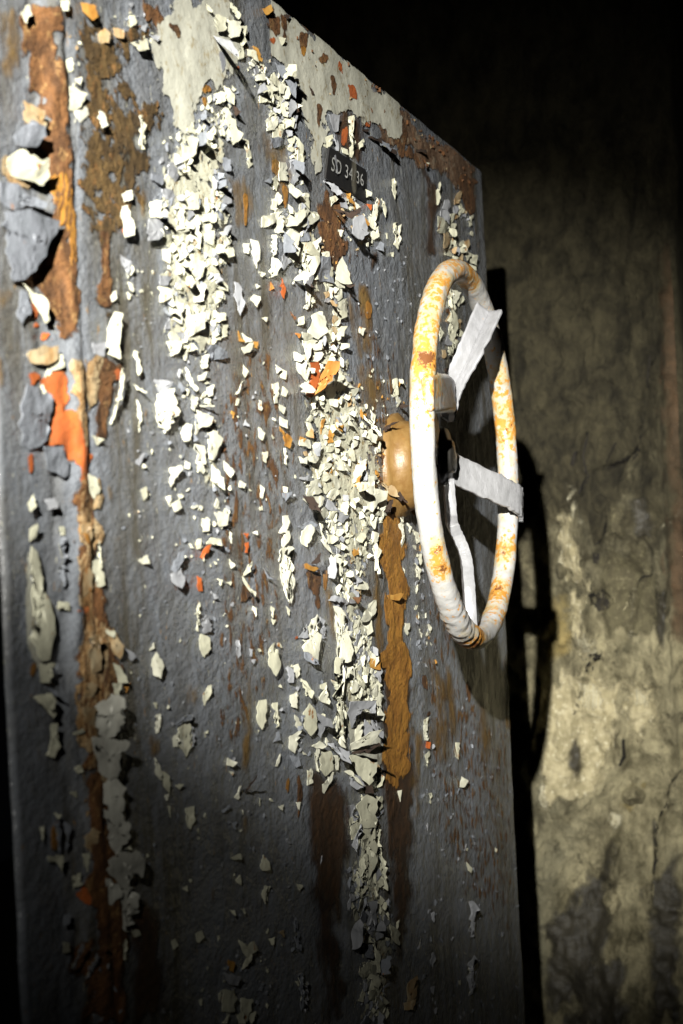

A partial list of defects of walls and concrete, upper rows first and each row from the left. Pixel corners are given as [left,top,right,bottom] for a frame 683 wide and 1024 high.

rust [3,0,164,446]
rust [364,78,478,255]
peeling [0,0,440,1024]
rust [300,524,315,547]
rust [304,563,333,621]
rust [375,514,512,958]
peeling [421,681,500,804]
peeling [419,801,498,937]
peeling [404,898,454,1015]